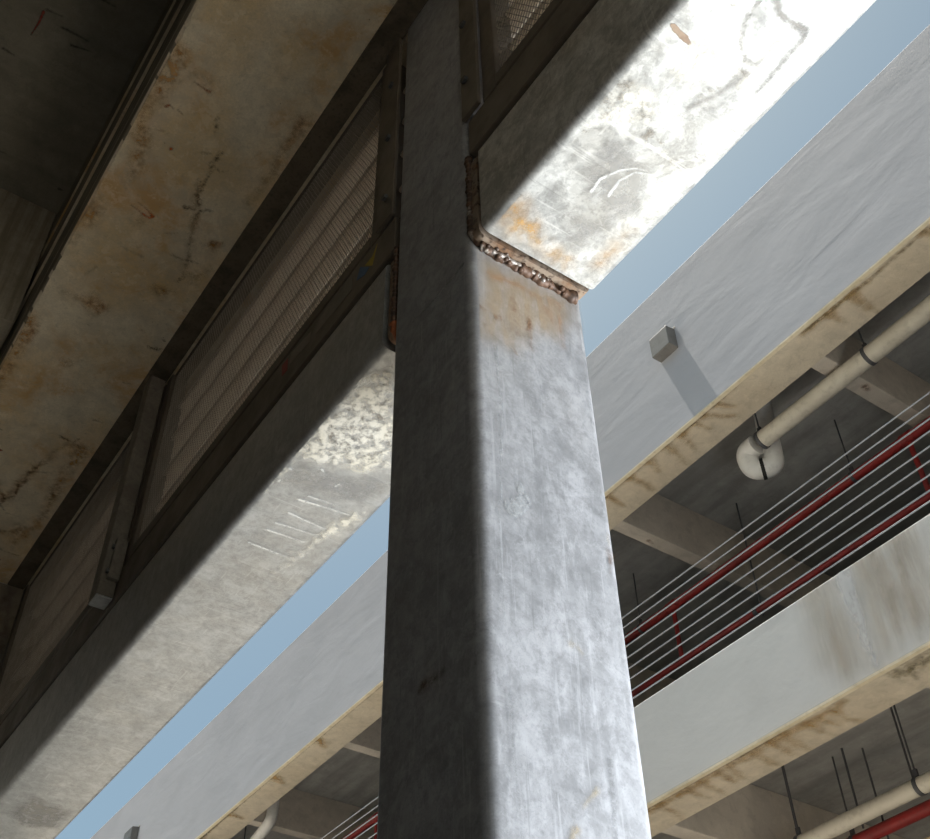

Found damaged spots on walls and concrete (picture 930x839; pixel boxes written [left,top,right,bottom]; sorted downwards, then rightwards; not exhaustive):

leakage [763,0,808,86]